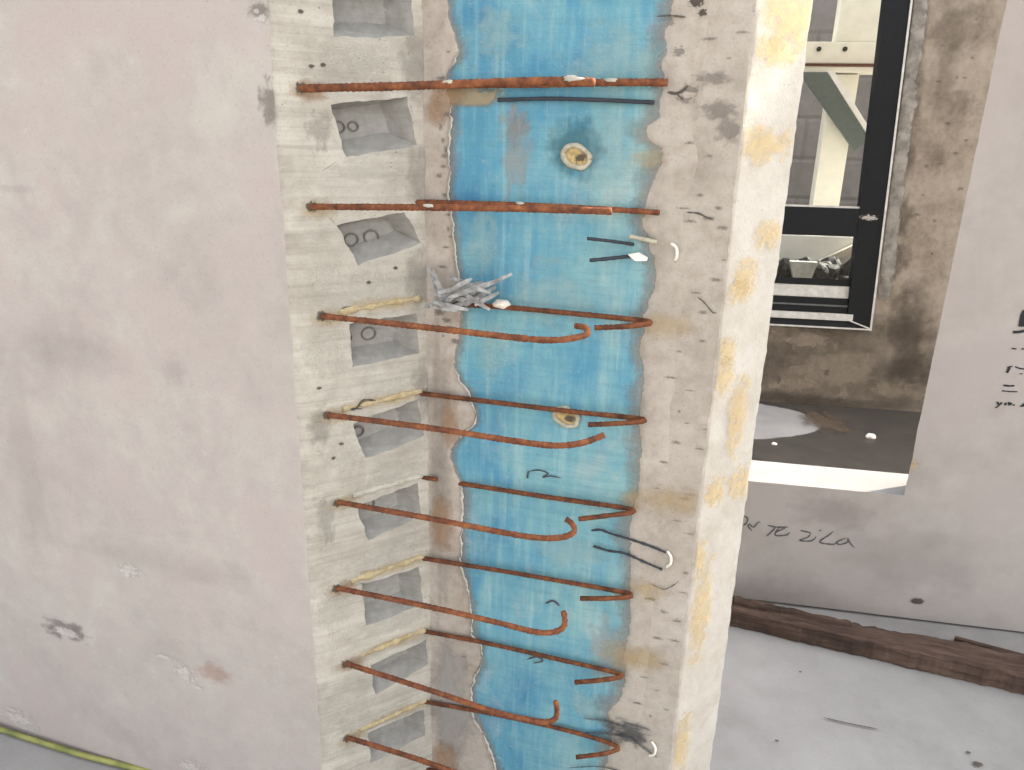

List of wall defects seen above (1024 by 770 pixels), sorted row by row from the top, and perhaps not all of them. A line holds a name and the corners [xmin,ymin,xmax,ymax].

peeling [296,0,740,770]
leakage [570,0,674,770]
leakage [752,334,925,474]